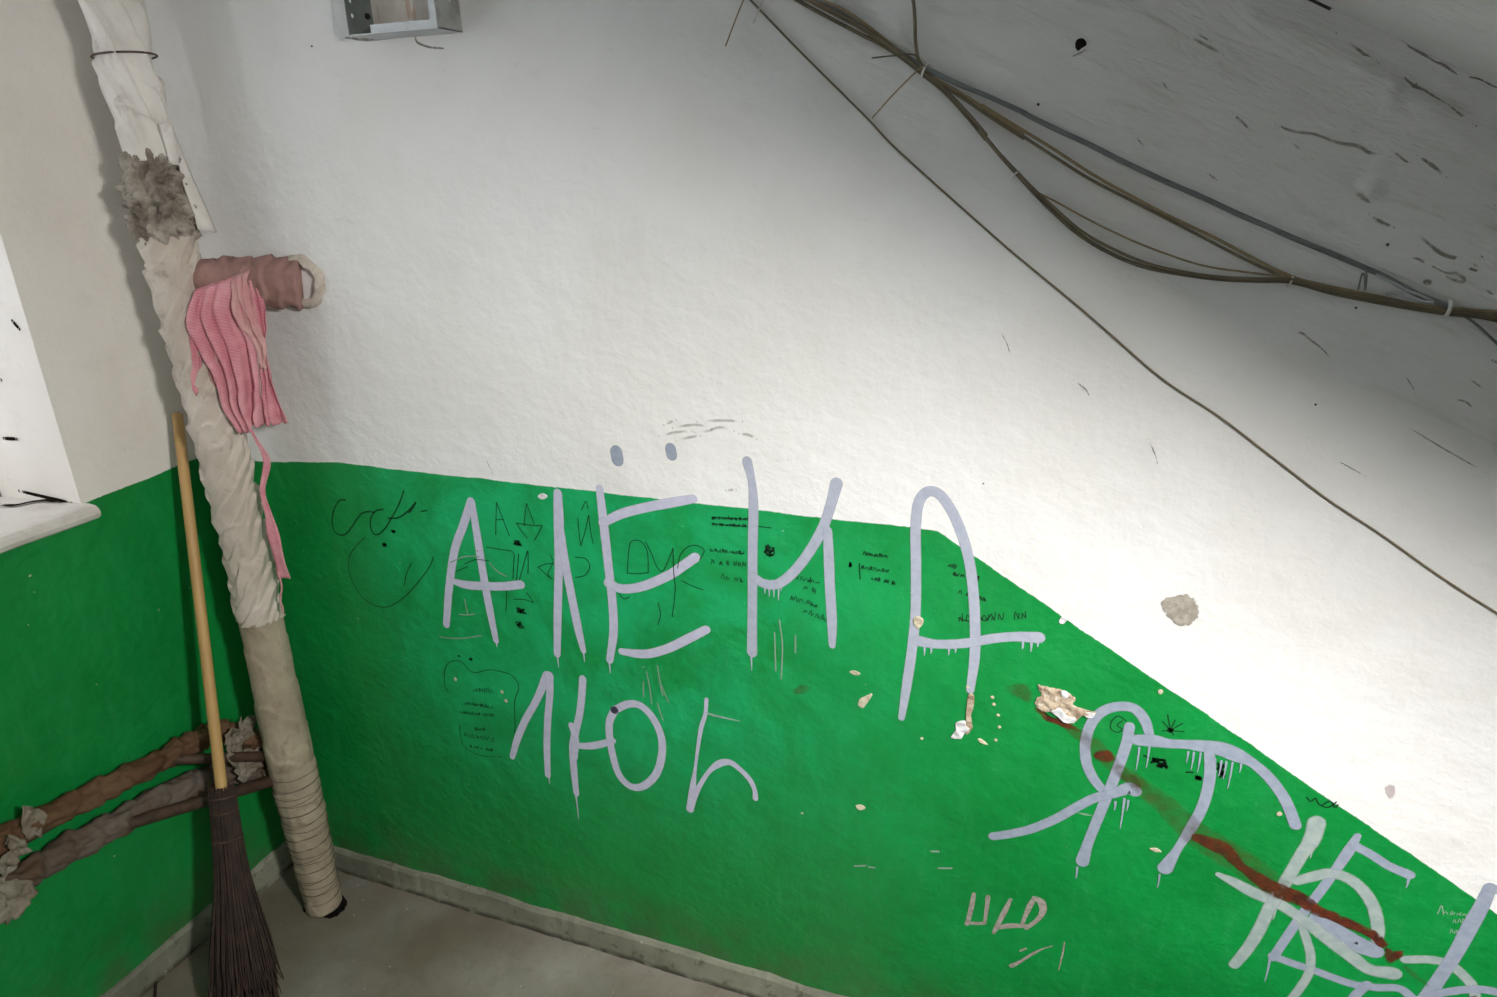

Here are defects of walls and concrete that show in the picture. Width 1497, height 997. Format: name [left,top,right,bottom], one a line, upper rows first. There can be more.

corrosion [1094,750,1114,761]
corrosion [1191,834,1403,963]